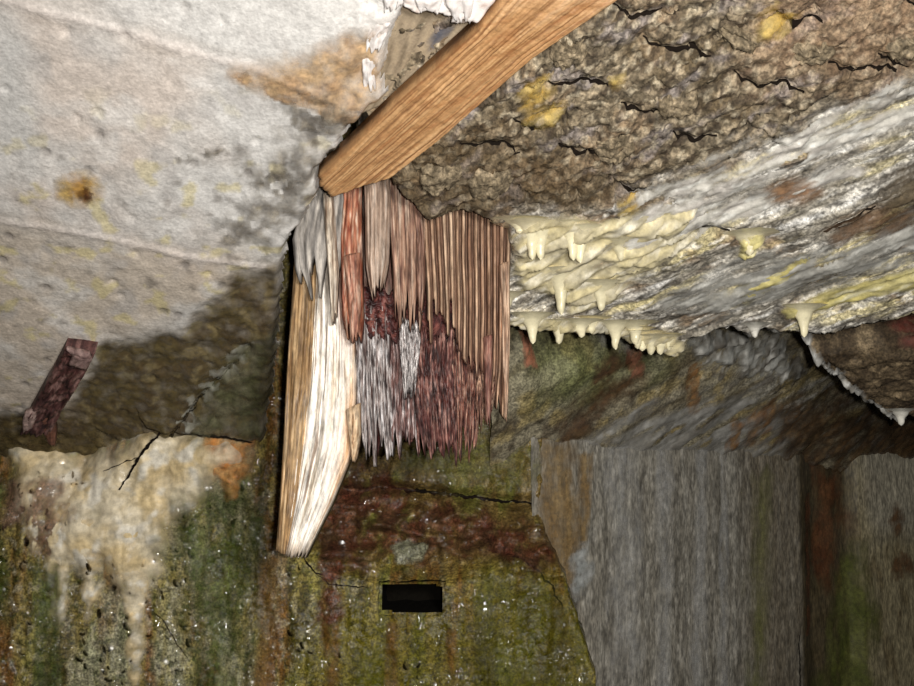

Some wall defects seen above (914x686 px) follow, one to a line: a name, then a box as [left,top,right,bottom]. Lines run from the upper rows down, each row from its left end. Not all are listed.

crack [613,2,711,58]
leakage [761,12,791,38]
leakage [238,36,379,147]
crack [548,77,658,113]
crack [828,52,909,72]
crack [460,118,595,156]
corrosion [59,178,95,202]
leakage [224,153,318,244]
leakage [489,79,914,473]
crack [104,353,252,490]
corrosion [205,437,252,500]
leakage [37,566,61,686]